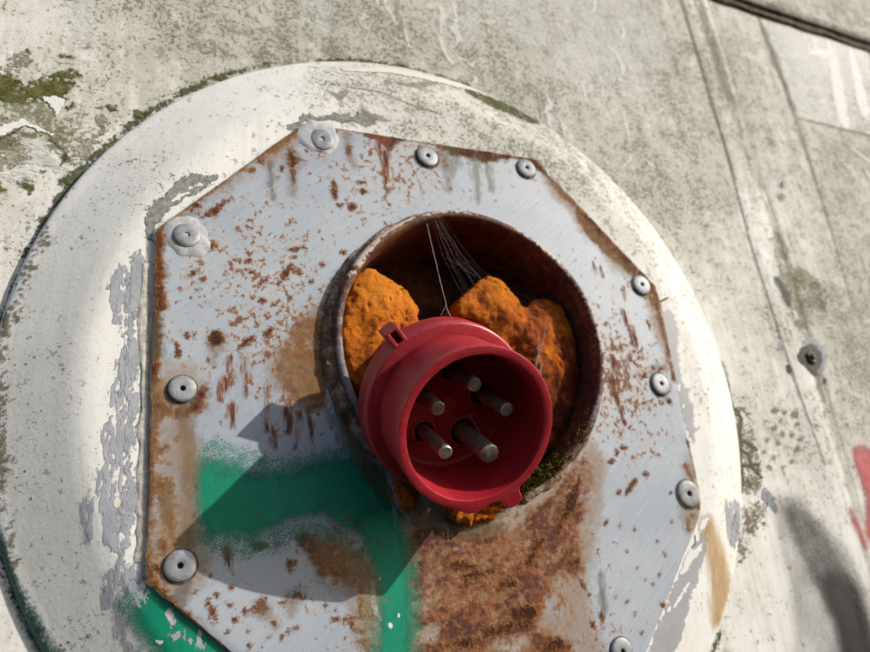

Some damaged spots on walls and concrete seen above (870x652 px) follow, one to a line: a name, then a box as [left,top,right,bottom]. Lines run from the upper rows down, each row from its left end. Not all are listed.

peeling [0,48,83,115]
peeling [0,104,117,195]
peeling [145,173,219,242]
rust [353,131,676,381]
rust [147,124,315,624]
rust [608,286,641,429]
peeling [81,249,151,652]
rust [617,470,649,496]
peeling [155,608,207,651]
rust [225,595,299,639]
rust [407,457,591,652]
peeling [649,517,709,652]